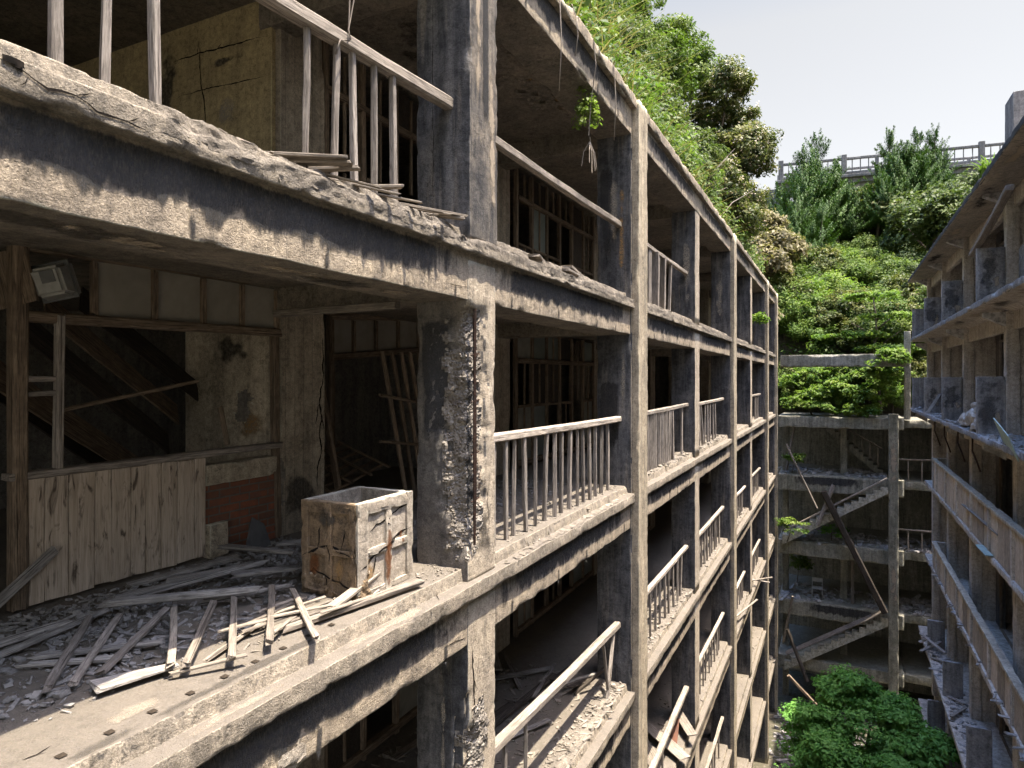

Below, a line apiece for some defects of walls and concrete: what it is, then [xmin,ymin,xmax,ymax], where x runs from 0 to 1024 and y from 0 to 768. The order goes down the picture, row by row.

crack [10,64,157,138]
crack [175,37,260,122]
damp [220,338,246,361]
crack [315,339,324,487]
spalling [441,301,484,562]
spalling [453,693,489,768]